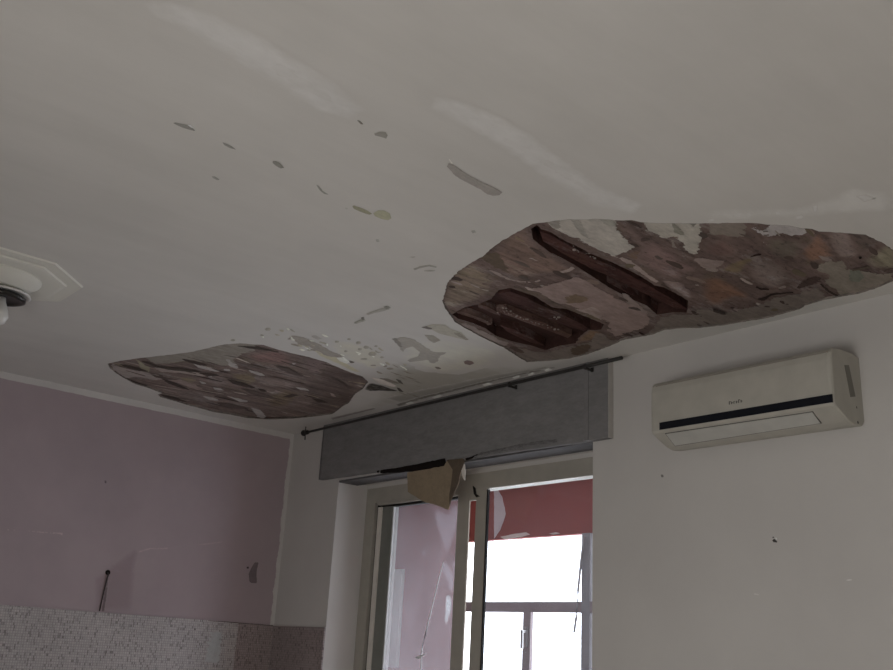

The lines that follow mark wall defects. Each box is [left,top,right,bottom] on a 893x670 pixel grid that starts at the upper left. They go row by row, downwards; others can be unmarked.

spalling [447,159,502,196]
peeling [108,278,893,420]